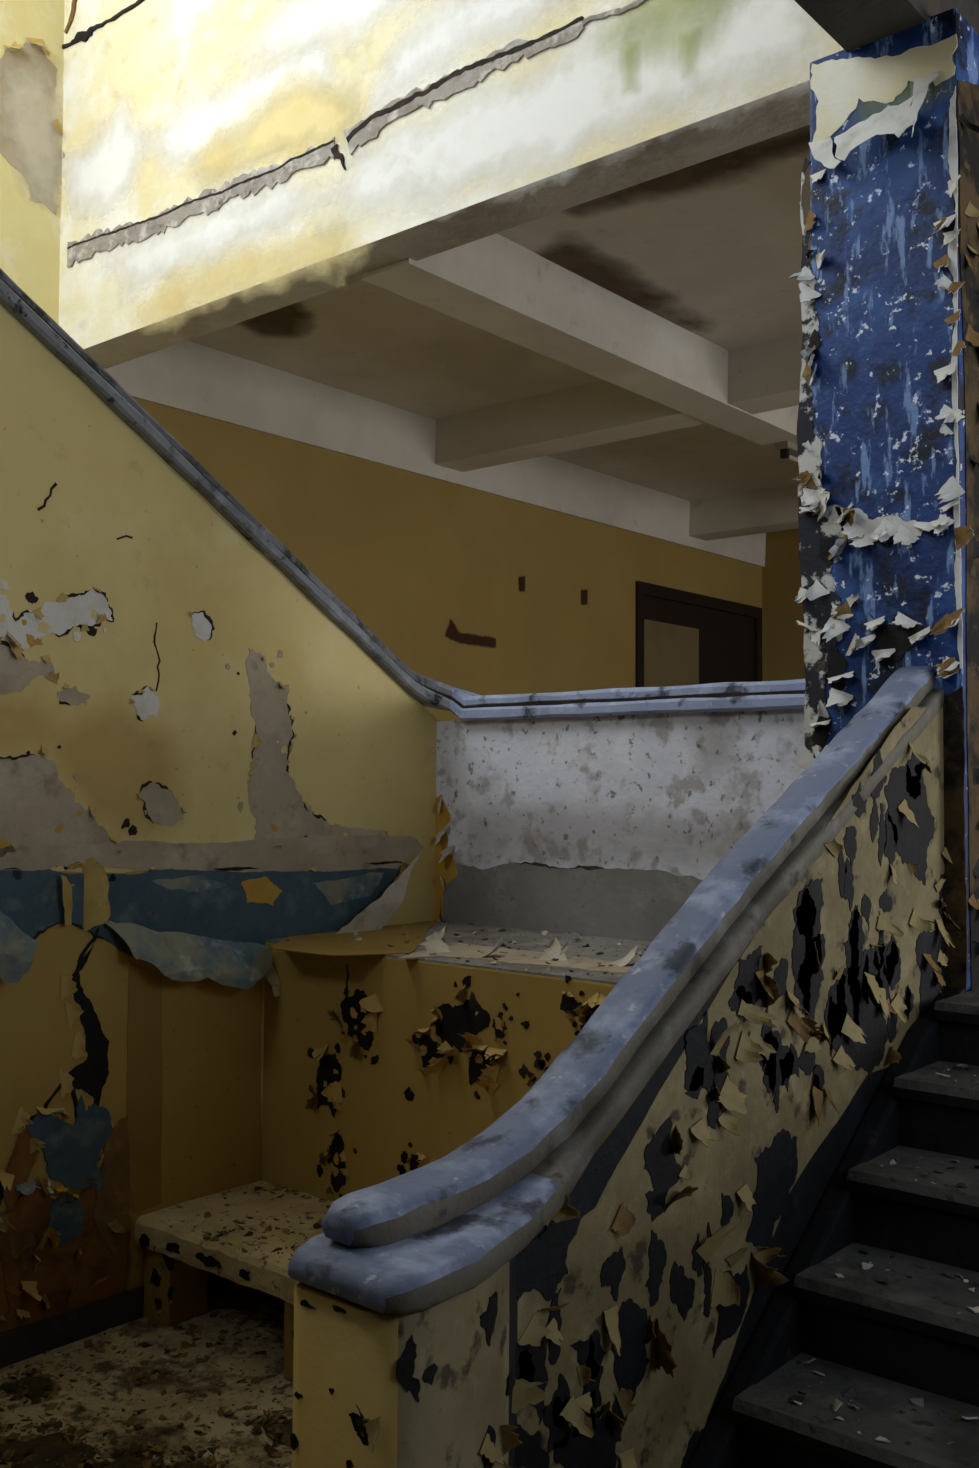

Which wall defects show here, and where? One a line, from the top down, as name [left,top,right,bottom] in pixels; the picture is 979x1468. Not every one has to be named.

peeling [0,0,566,215]
crack [62,0,648,268]
water stain [242,303,308,336]
water stain [540,245,699,328]
flaking render [0,580,114,705]
peeling [189,611,215,641]
peeling [343,0,979,1468]
peeling [0,648,702,1101]
peeling [11,1091,114,1248]
crack [29,928,109,1125]
peeling [305,988,384,1198]
peeling [139,1234,221,1316]